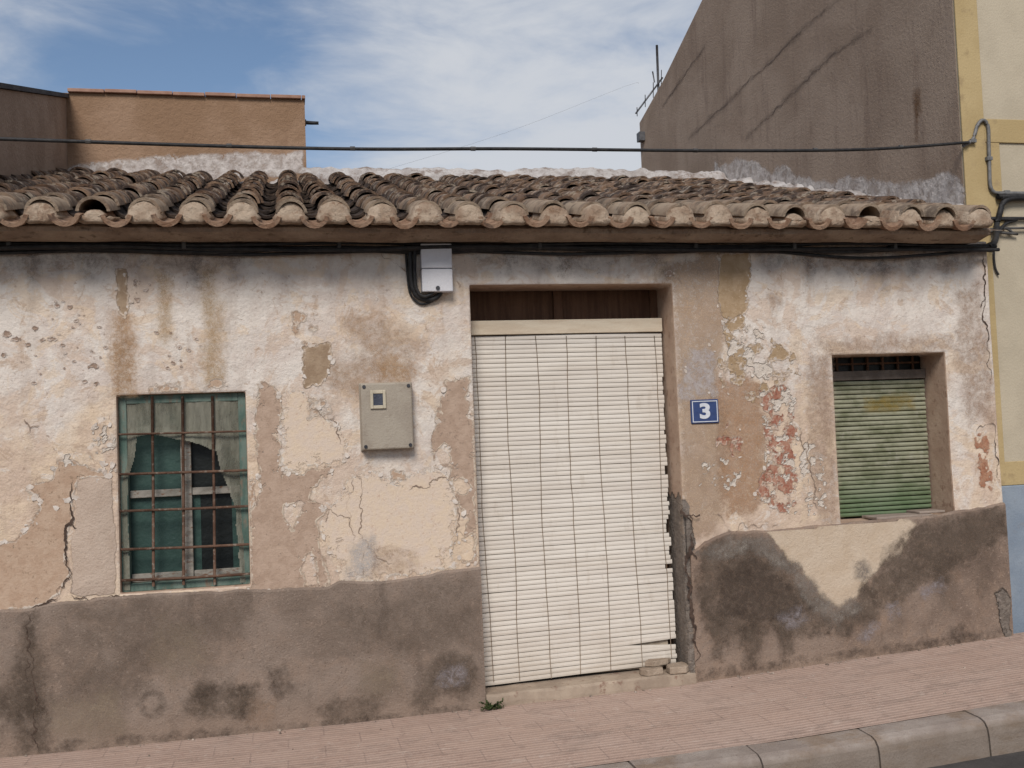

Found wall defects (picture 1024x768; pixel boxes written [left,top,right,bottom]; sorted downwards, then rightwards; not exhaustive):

spalling [2,300,108,386]
crack [23,482,125,749]
crack [322,475,392,565]
peeling [247,310,479,590]
crack [411,475,466,554]
spalling [668,492,696,673]
flaking render [679,253,827,516]
water stain [697,505,1008,668]
crack [981,255,992,380]
spalling [994,588,1012,637]